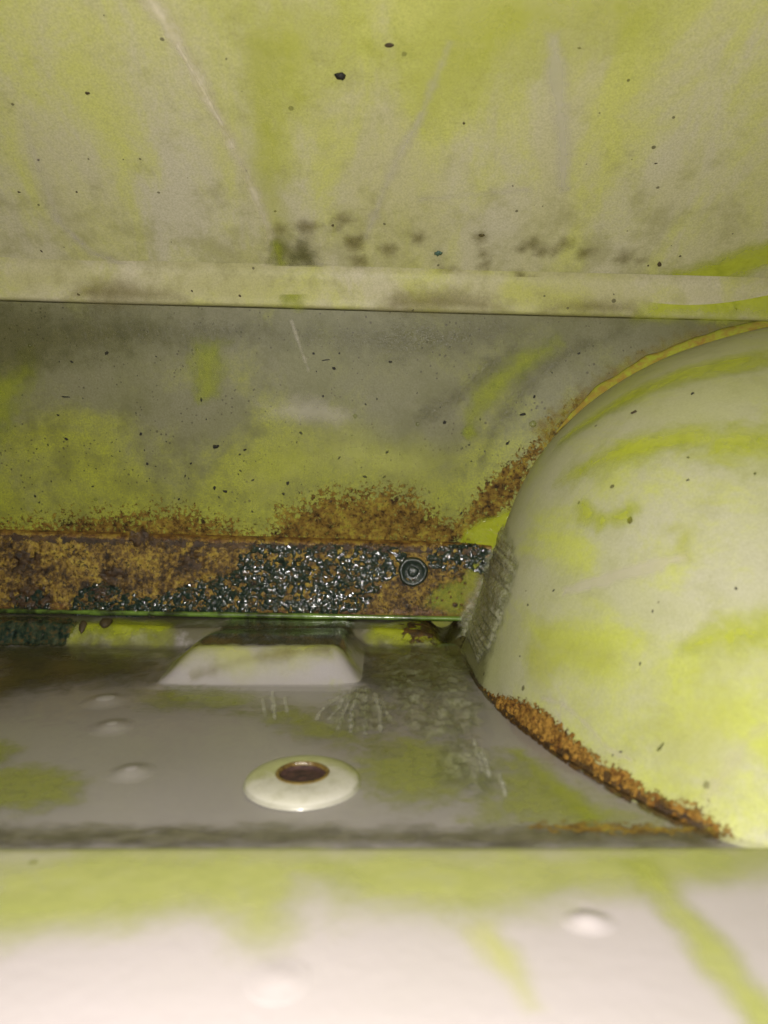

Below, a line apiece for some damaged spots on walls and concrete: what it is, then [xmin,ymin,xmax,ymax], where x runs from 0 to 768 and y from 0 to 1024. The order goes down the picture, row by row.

corrosion [0,395,587,616]
corrosion [459,647,734,843]